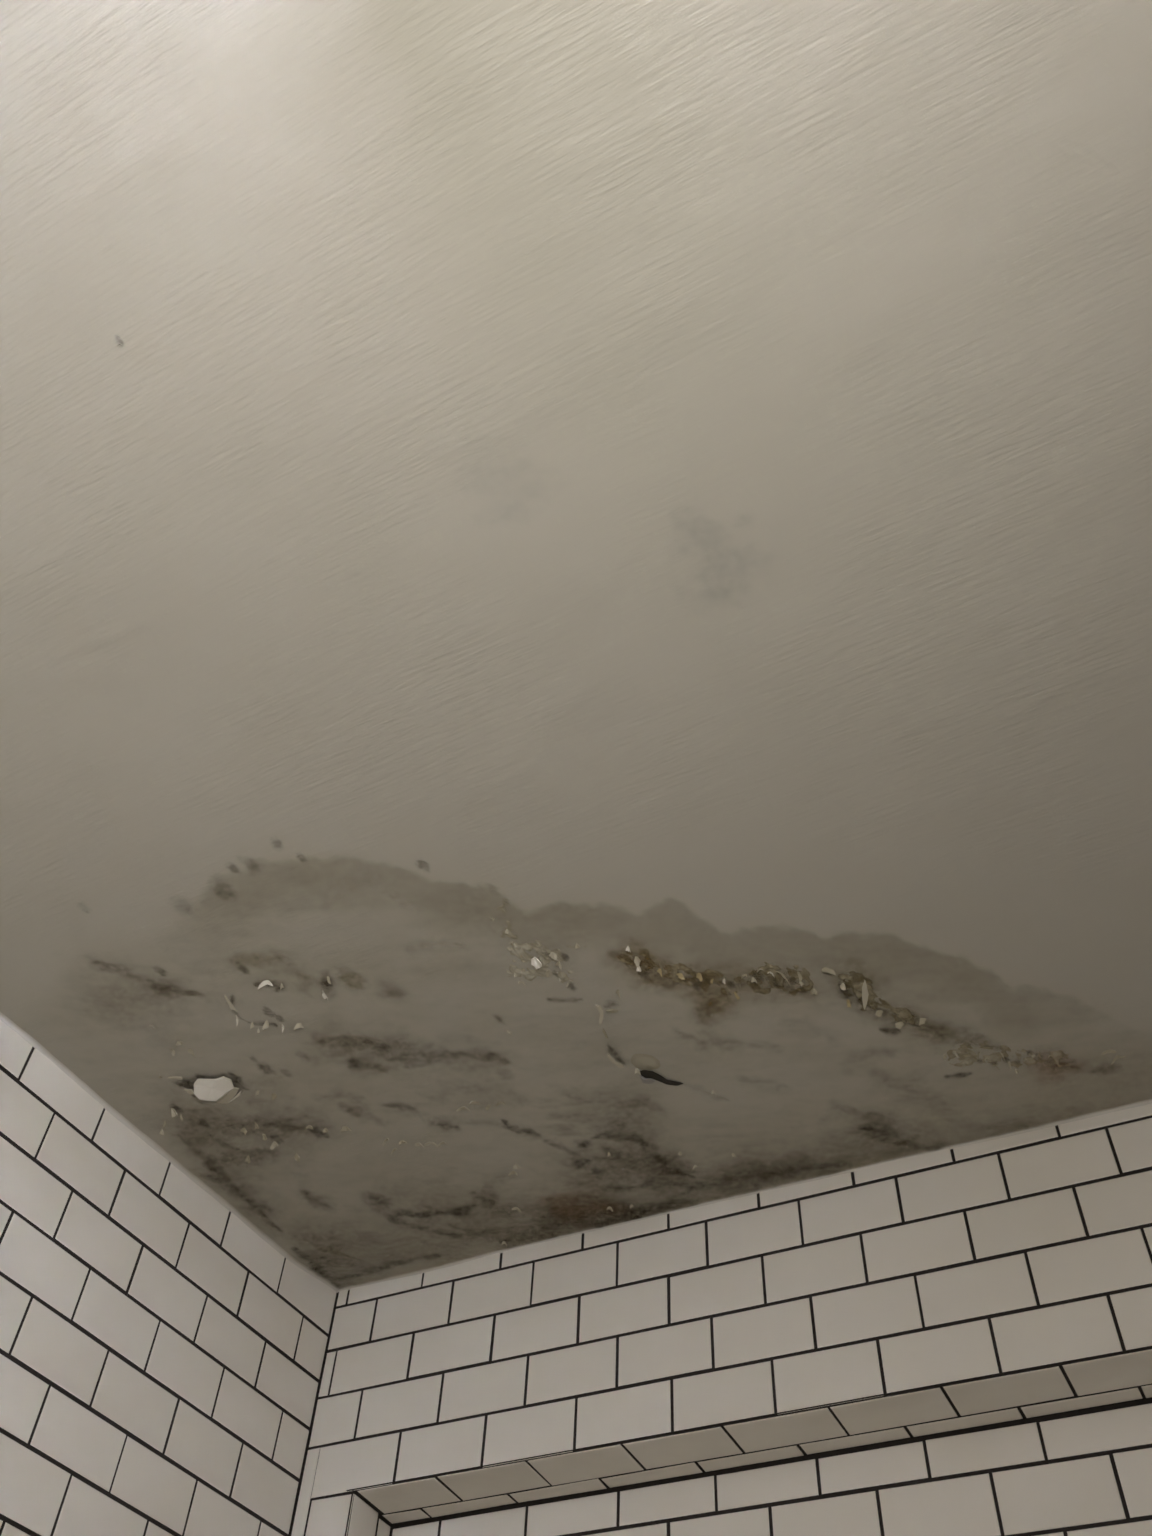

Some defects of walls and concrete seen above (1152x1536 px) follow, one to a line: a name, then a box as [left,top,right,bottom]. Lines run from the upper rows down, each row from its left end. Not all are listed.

peeling [490,898,587,989]
peeling [618,946,936,1033]
peeling [159,1076,277,1135]